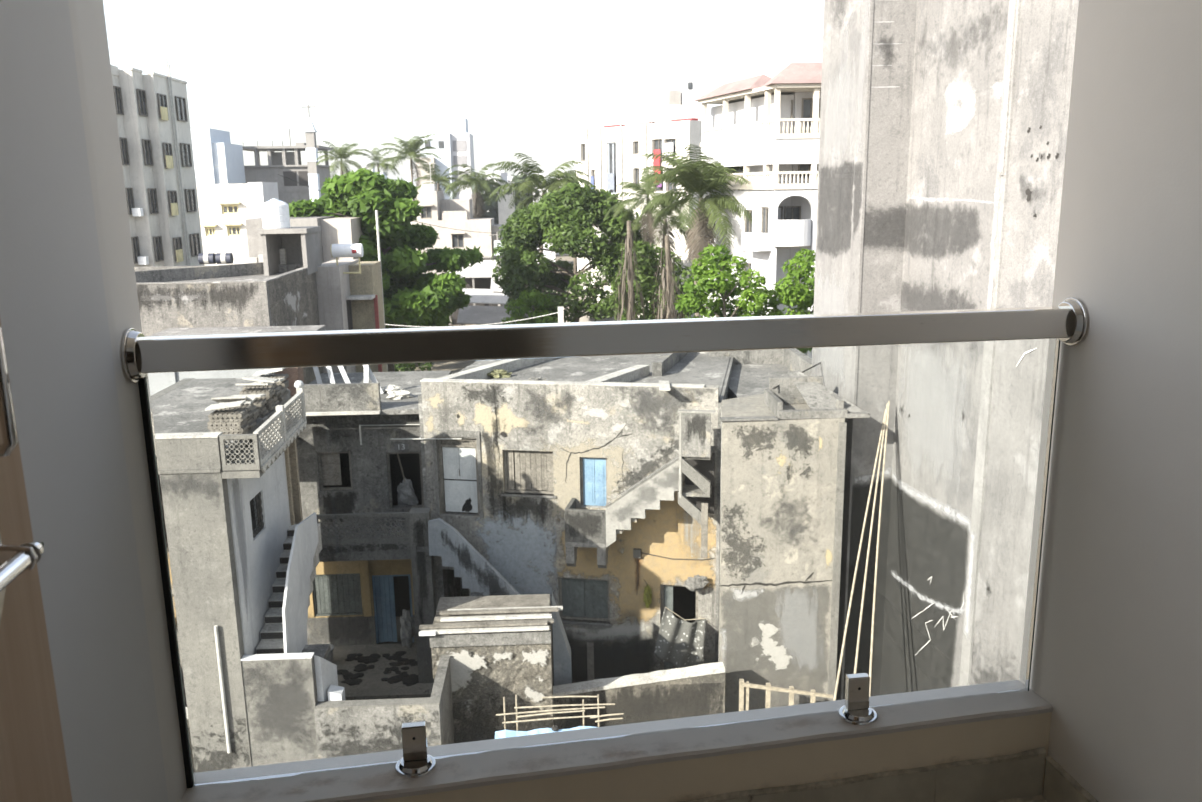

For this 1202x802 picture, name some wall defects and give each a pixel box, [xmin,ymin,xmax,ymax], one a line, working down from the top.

water stain [817,163,990,256]
water stain [532,393,573,421]
water stain [462,384,548,523]
water stain [737,425,814,480]
water stain [719,504,764,600]
flaking render [751,620,793,670]
flaking render [436,649,549,713]